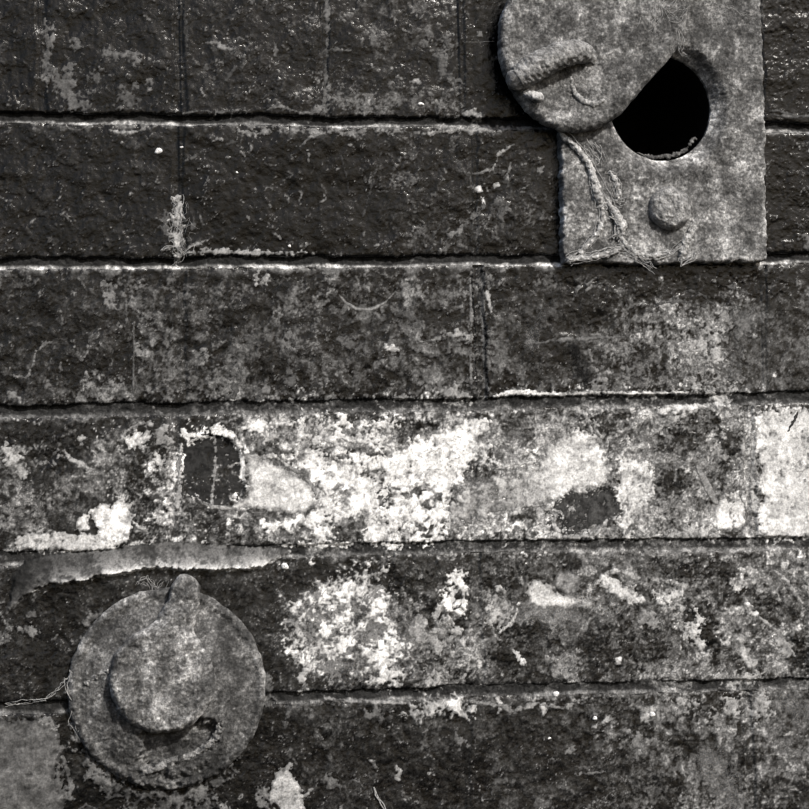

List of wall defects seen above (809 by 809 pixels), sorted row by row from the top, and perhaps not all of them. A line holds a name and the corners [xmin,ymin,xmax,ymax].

peeling [100,279,149,325]
peeling [247,268,271,290]
peeling [12,341,53,379]
peeling [6,391,22,405]
peeling [52,310,658,555]
peeling [525,285,809,547]
peeling [14,500,147,555]
peeling [277,561,473,696]
peeling [732,571,796,659]
peeling [481,568,776,746]
peeling [252,762,305,809]
peeling [321,772,360,793]